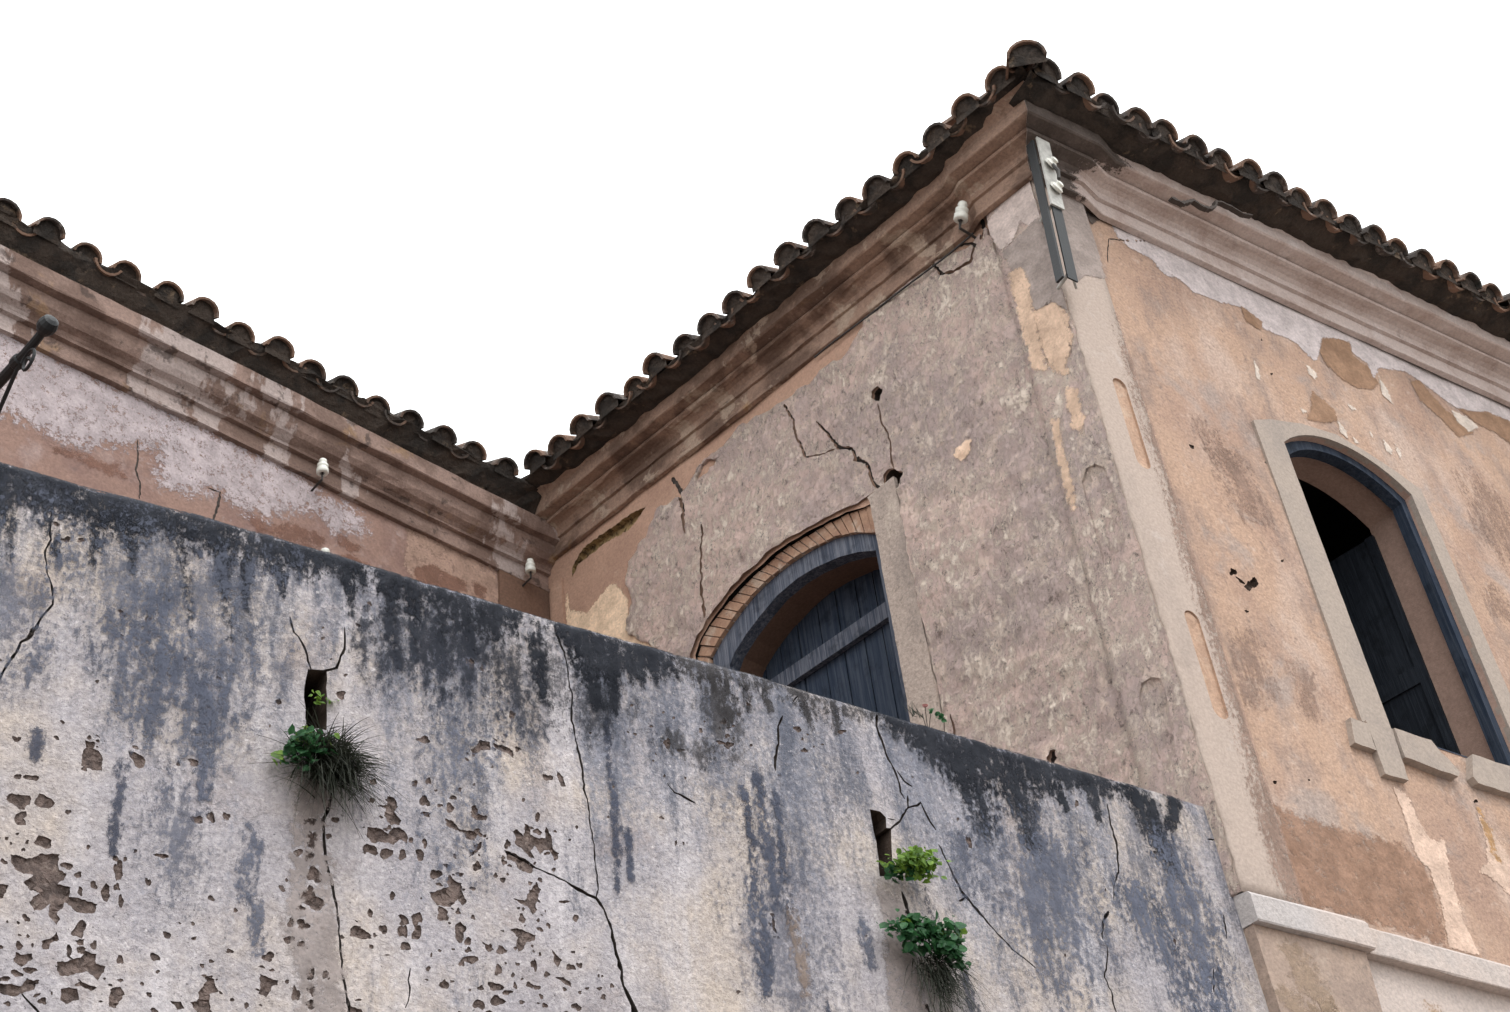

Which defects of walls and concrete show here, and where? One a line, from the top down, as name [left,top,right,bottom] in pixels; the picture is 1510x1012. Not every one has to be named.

peeling [1112,226,1510,457]
crack [0,513,54,679]
water stain [0,484,304,928]
spalling [0,774,340,1012]
crack [321,785,351,1012]
spalling [340,777,614,1012]
crack [502,628,638,1012]
flaking render [565,583,653,648]
water stain [603,717,635,894]
water stain [660,670,832,1012]
crack [875,715,1035,968]
water stain [945,802,1246,1012]